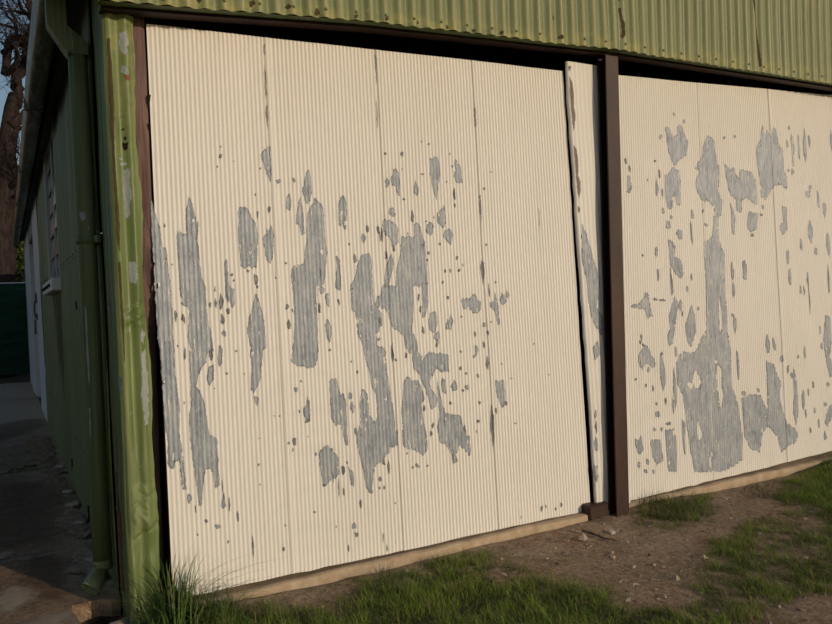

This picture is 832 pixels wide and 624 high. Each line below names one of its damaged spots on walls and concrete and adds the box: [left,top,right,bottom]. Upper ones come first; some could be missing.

peeling [118,30,129,55]
peeling [119,158,132,218]
peeling [259,146,281,184]
peeling [140,329,150,426]
peeling [150,197,239,522]
peeling [237,206,274,406]
peeling [285,153,512,495]
peeling [581,225,603,360]
peeling [631,113,832,474]